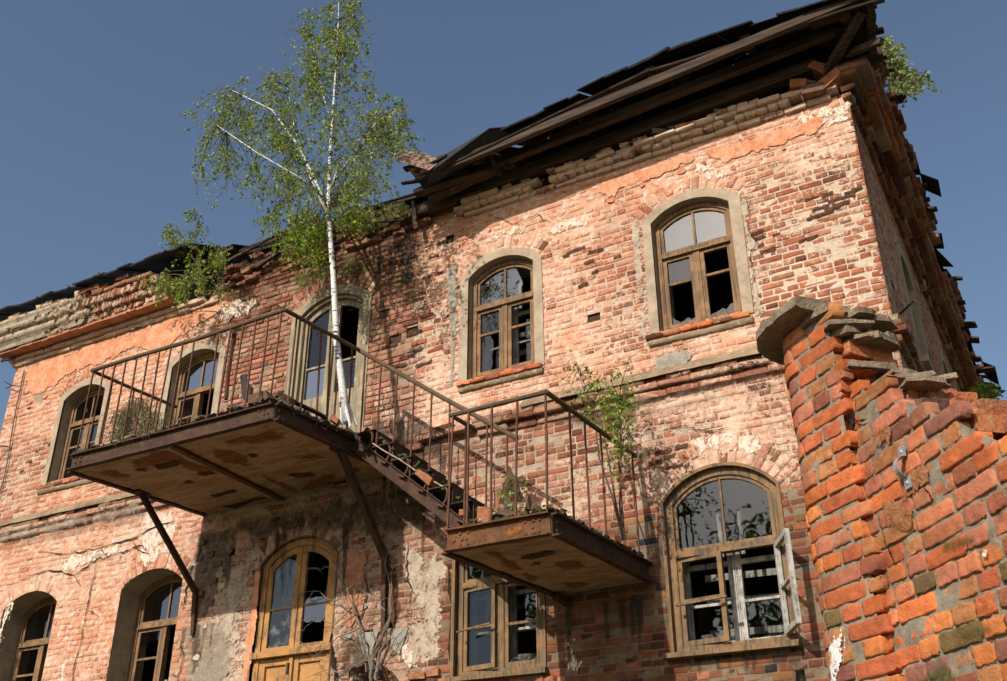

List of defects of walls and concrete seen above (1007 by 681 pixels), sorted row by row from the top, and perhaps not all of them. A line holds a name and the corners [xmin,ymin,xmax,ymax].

flaking render [598,117,823,202]
flaking render [24,296,257,410]
corrosion [215,432,284,467]
damp [236,477,438,594]
crack [20,521,175,681]
damp [180,625,213,671]
flaking render [340,537,452,681]
damp [829,627,846,681]